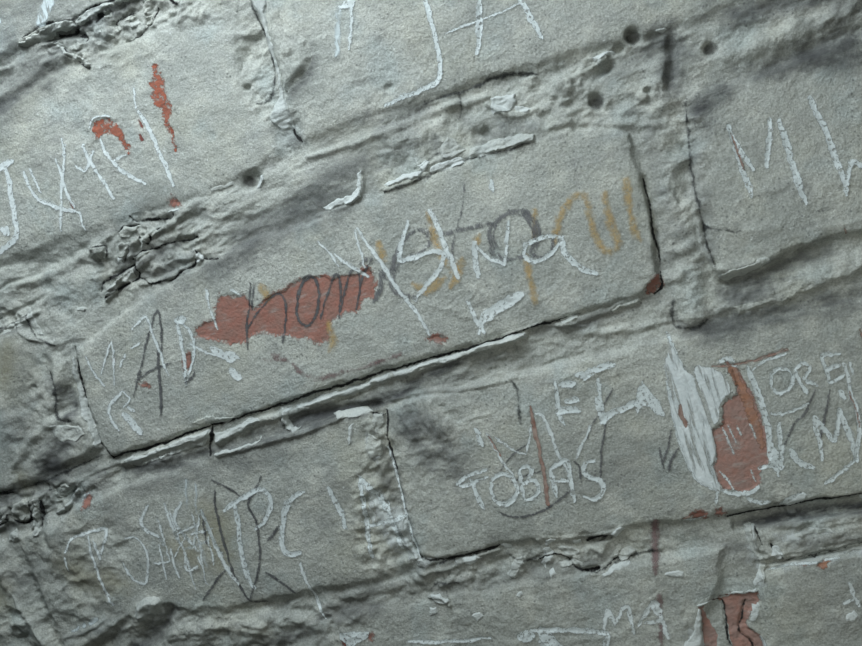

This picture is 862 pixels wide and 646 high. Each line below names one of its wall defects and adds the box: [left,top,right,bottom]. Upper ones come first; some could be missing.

peeling [18,0,154,68]
crack [685,104,733,264]
peeling [89,225,159,297]
crack [0,313,581,526]
spalling [712,361,769,492]
crack [372,409,655,586]
spalling [682,507,726,521]
spalling [684,522,862,646]
crack [727,493,861,560]